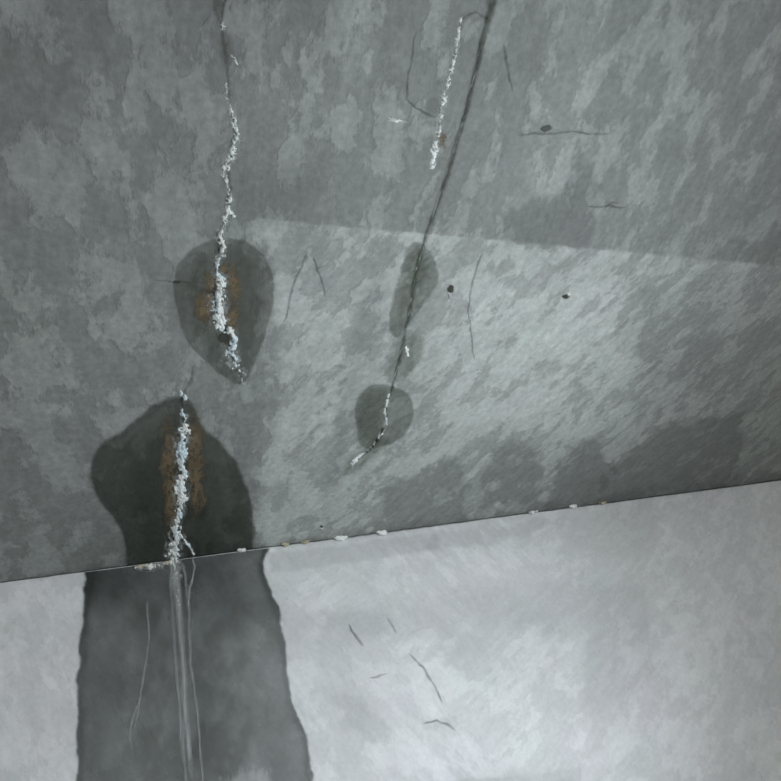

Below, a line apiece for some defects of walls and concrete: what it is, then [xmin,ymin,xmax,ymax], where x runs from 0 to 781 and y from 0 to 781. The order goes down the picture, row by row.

crack [460,43,481,131]
rust [196,273,216,320]
rust [219,263,241,330]
rust [159,428,178,526]
rust [187,423,206,505]
water stain [77,389,282,781]